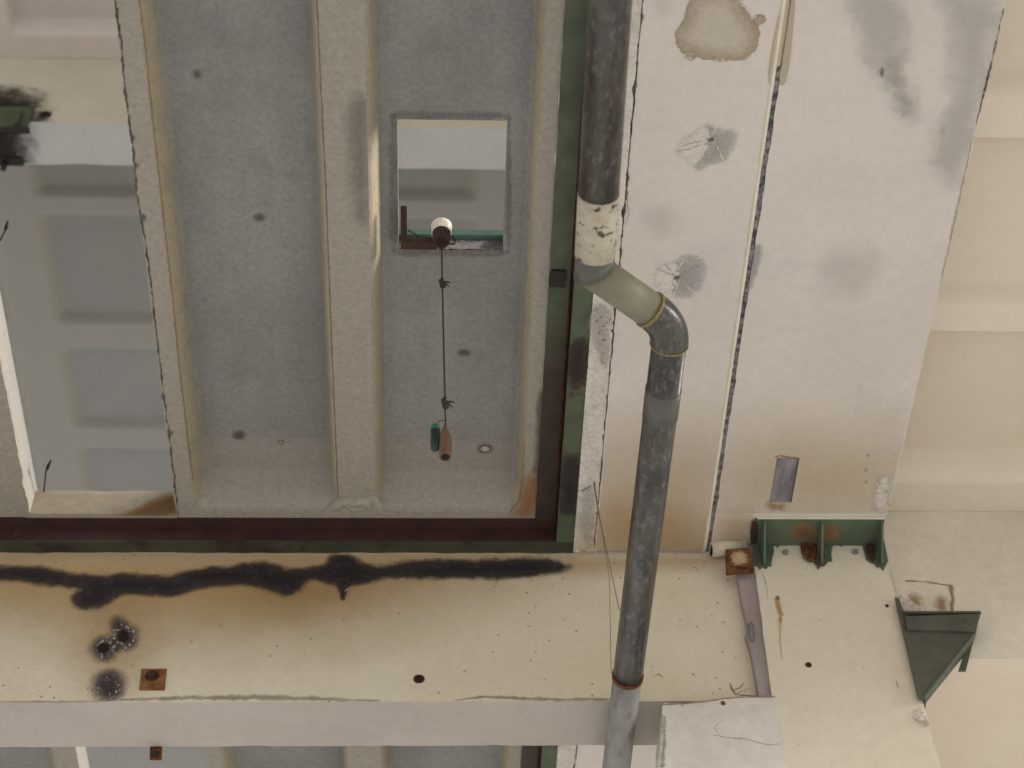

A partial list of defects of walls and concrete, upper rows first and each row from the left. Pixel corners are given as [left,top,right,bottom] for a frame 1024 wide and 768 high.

damp [675,0,795,85]
crack [619,0,644,266]
corrosion [725,547,754,575]
corrosion [775,596,784,658]